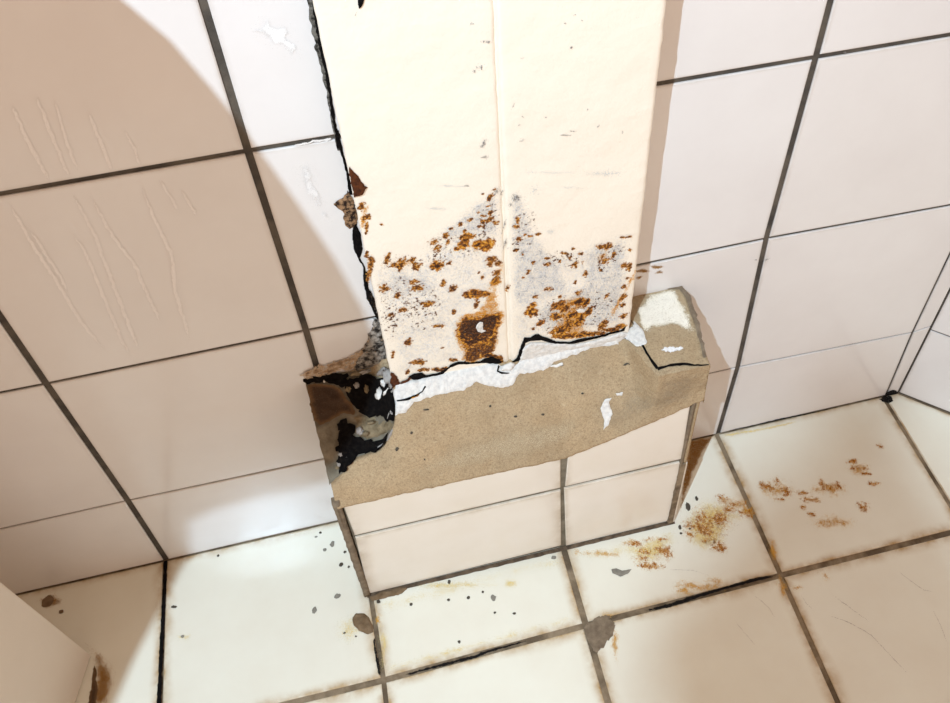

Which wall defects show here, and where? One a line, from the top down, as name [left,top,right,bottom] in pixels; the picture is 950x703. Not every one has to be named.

rust [349,167,383,235]
rust [364,188,639,401]
spalling [300,185,630,485]
crack [625,320,709,370]
rust [575,437,757,571]
rust [756,477,851,528]
rust [849,458,879,486]
rust [674,577,724,594]